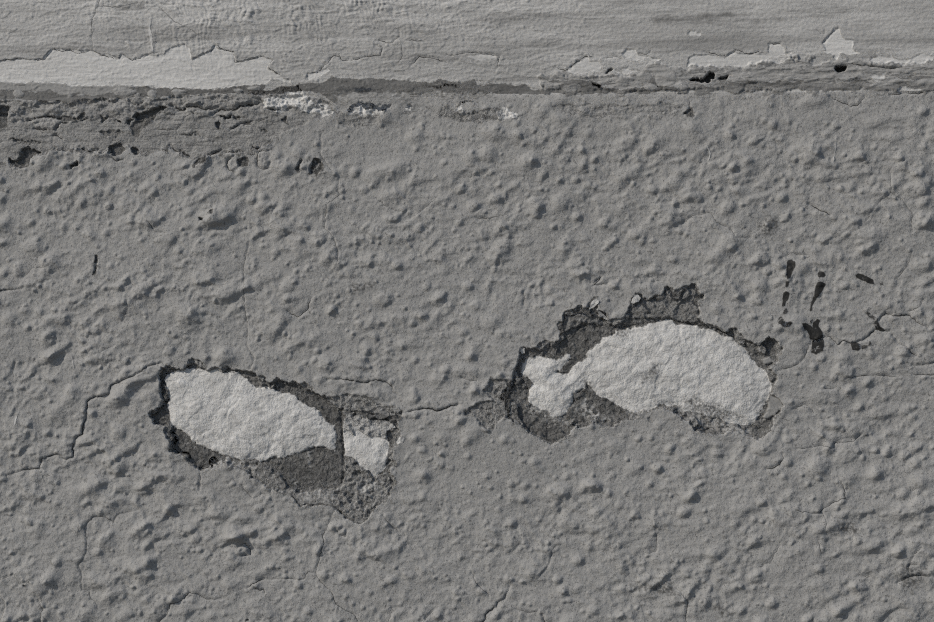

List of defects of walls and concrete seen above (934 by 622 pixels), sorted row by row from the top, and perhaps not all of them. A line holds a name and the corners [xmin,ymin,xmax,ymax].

peeling [539,27,934,119]
crack [15,363,159,473]
spalling [149,357,412,524]
spalling [465,283,783,444]
crack [779,281,934,389]